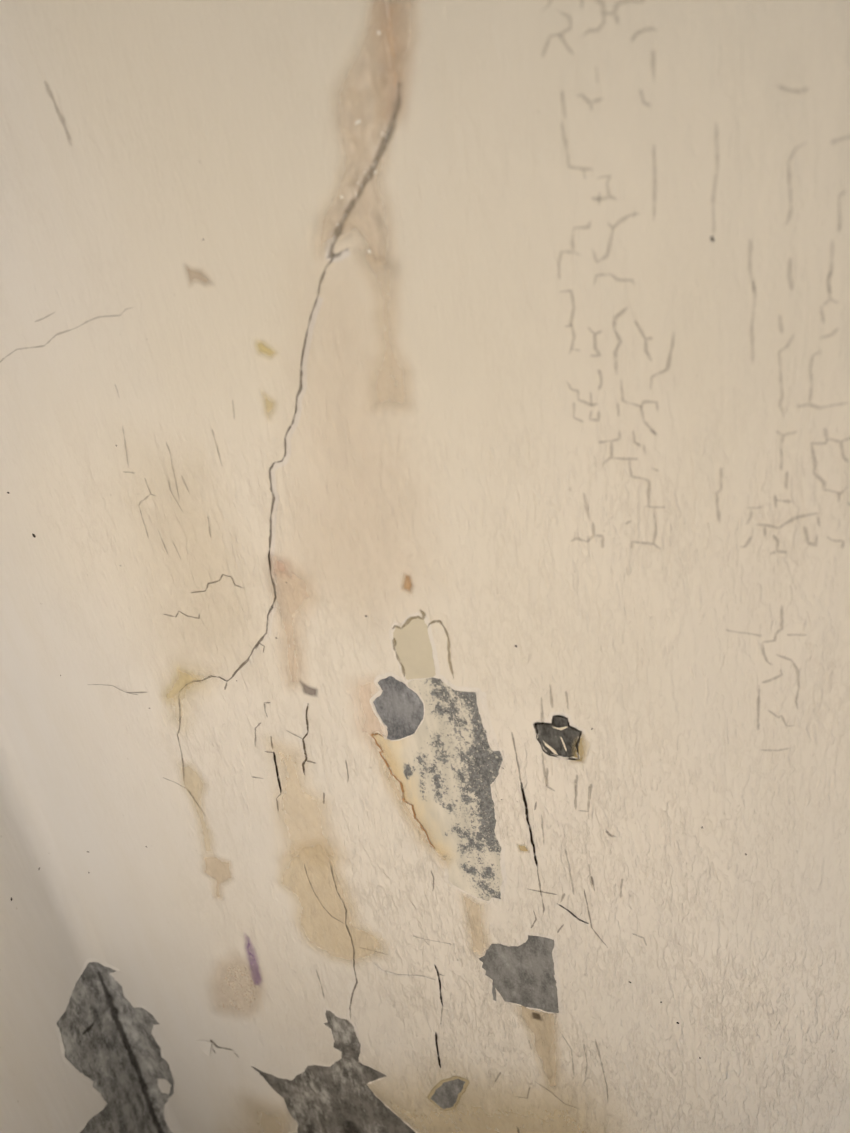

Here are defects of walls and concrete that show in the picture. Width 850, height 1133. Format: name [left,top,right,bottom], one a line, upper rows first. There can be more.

crack [325,80,401,262]
crack [179,295,323,694]
crack [270,701,309,793]
peeling [369,611,507,904]
peeling [531,711,585,761]
crack [516,781,538,868]
crack [325,857,443,1068]
peeling [475,932,562,1015]
peeling [54,958,177,1133]
peeling [247,1007,419,1133]
peeling [427,1076,469,1111]